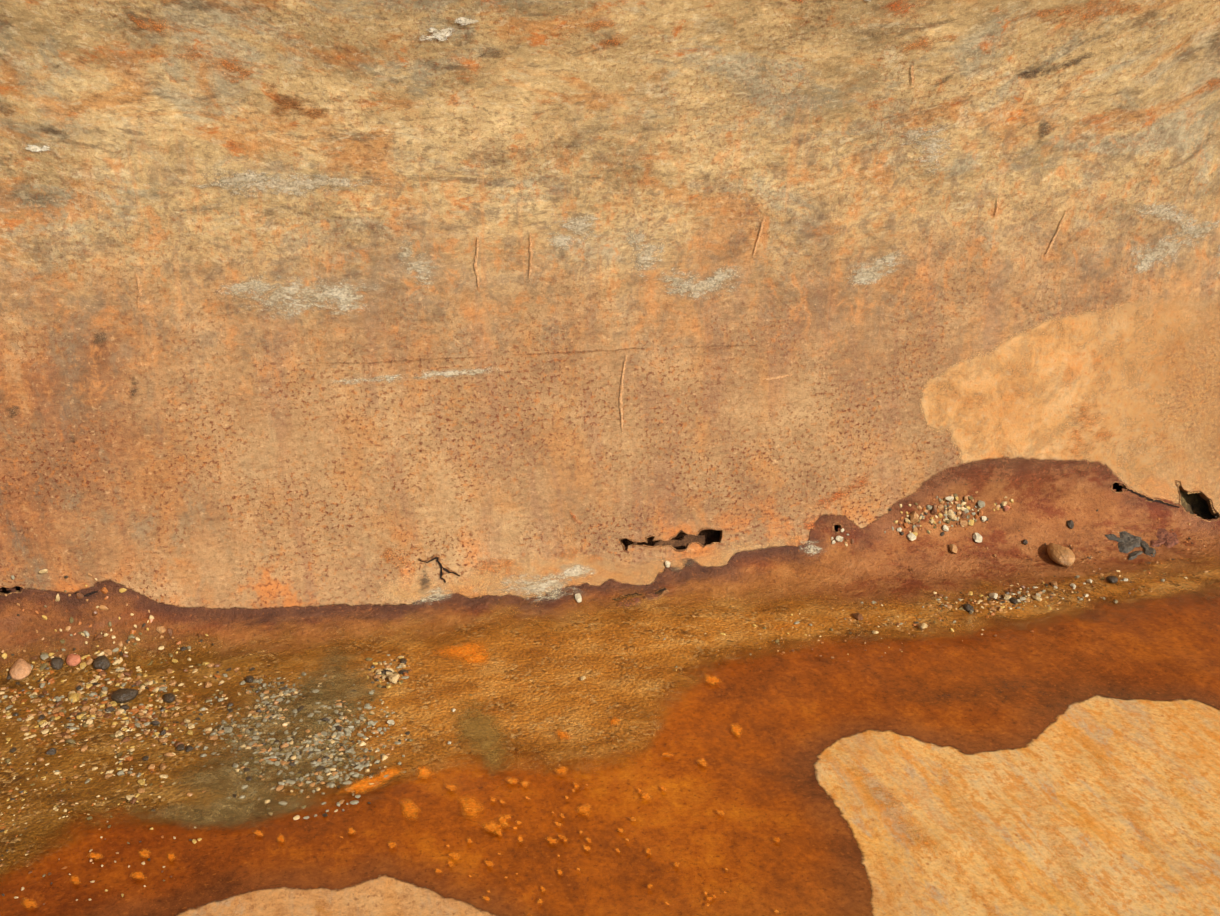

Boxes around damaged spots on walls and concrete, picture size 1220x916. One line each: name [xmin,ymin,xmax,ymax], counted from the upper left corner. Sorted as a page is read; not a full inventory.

corrosion [274,94,326,118]
crack [1125,487,1180,508]
crack [419,554,461,583]
damp [0,303,1220,916]